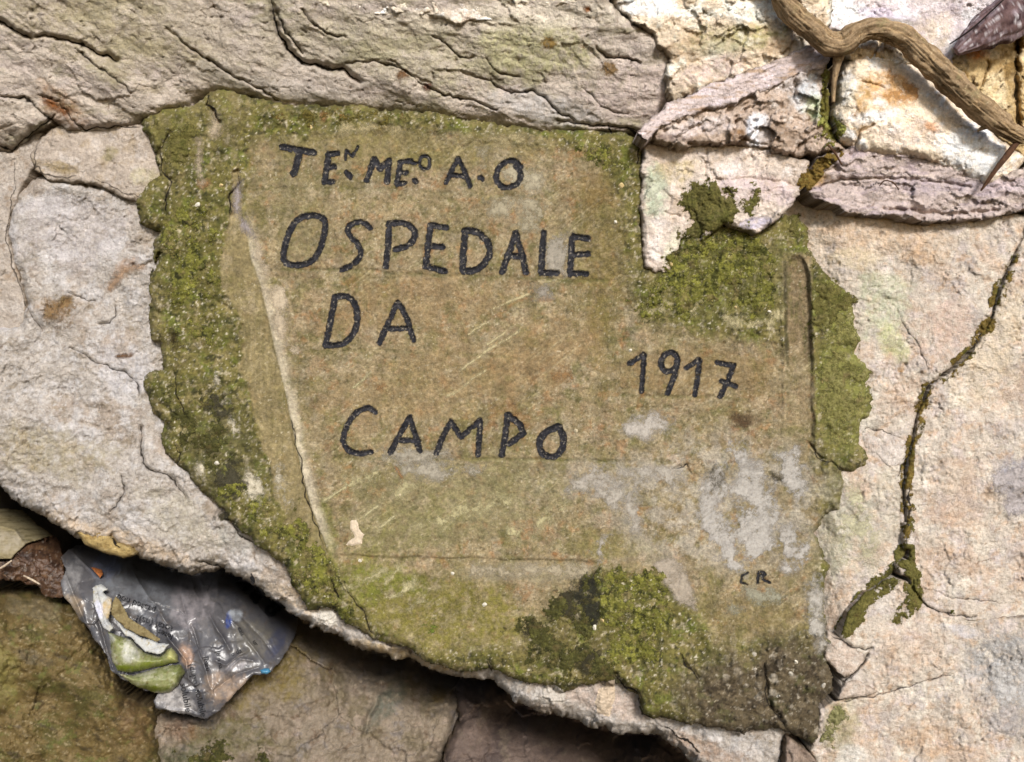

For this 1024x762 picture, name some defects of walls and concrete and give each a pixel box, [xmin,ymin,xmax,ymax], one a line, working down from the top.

crack [271,0,647,164]
water stain [622,412,669,440]
water stain [732,413,751,427]
water stain [567,466,685,534]
water stain [696,441,810,614]
crack [898,454,912,544]
water stain [471,562,603,628]
water stain [654,558,696,610]